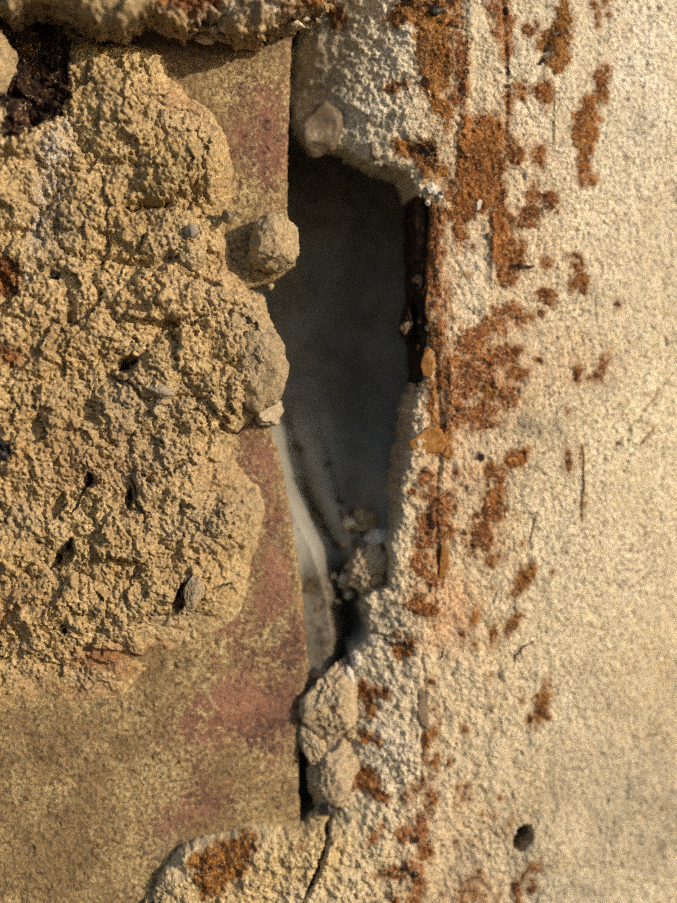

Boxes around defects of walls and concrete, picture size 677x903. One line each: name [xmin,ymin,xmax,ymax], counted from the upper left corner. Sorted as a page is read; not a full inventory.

peeling [0,116,23,137]
corrosion [570,64,613,188]
corrosion [381,0,575,462]
corrosion [565,252,590,295]
corrosion [404,446,532,619]
corrosion [510,563,537,598]
corrosion [357,679,392,719]
peeling [416,678,429,729]
corrosion [520,680,553,732]
corrosion [351,721,452,903]
corrosion [185,827,258,899]
crack [303,816,357,900]